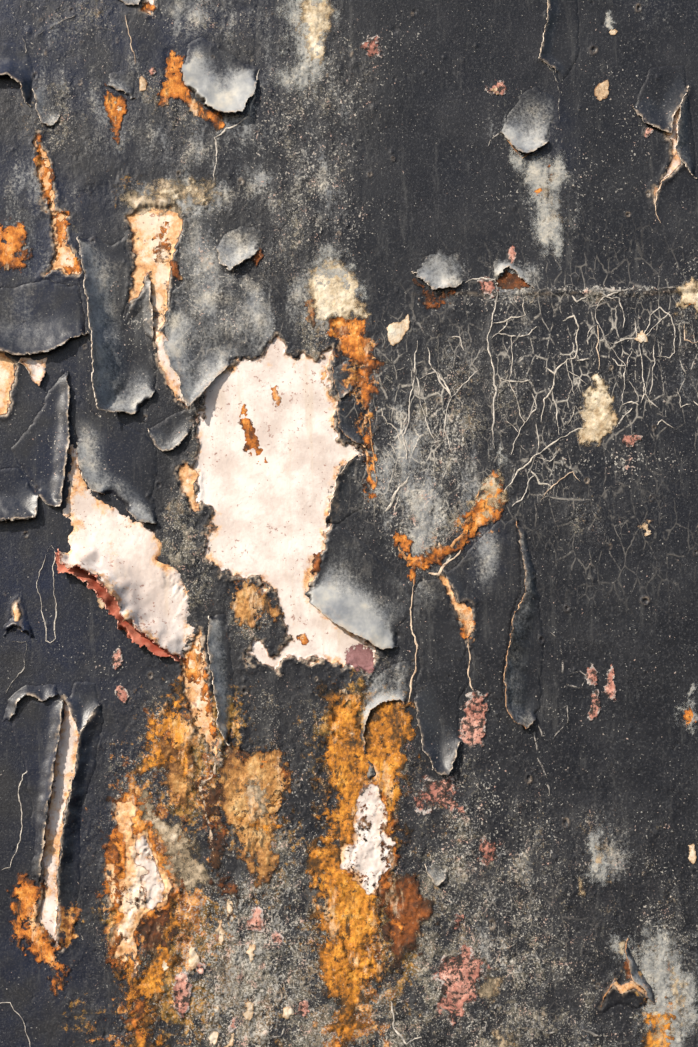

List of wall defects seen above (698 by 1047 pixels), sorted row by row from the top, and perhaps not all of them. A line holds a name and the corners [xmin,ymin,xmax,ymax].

peeling [120,0,194,20]
peeling [0,42,60,126]
peeling [139,37,260,179]
crack [381,276,698,512]
rust [393,470,507,585]
peeling [0,203,544,1020]
rust [128,679,440,1047]
efflorescence [579,828,611,895]
rust [6,871,71,996]
rust [110,898,193,1047]
peeling [209,998,254,1047]
water stain [493,1029,521,1047]